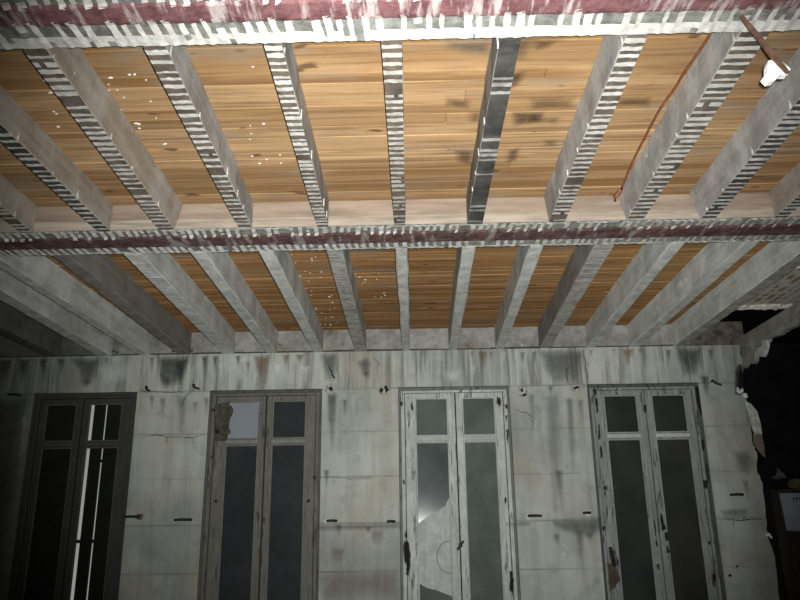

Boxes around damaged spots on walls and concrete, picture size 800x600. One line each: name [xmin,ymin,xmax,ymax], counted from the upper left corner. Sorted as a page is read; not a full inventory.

water stain [161,359,185,378]
peeling [735,365,765,458]